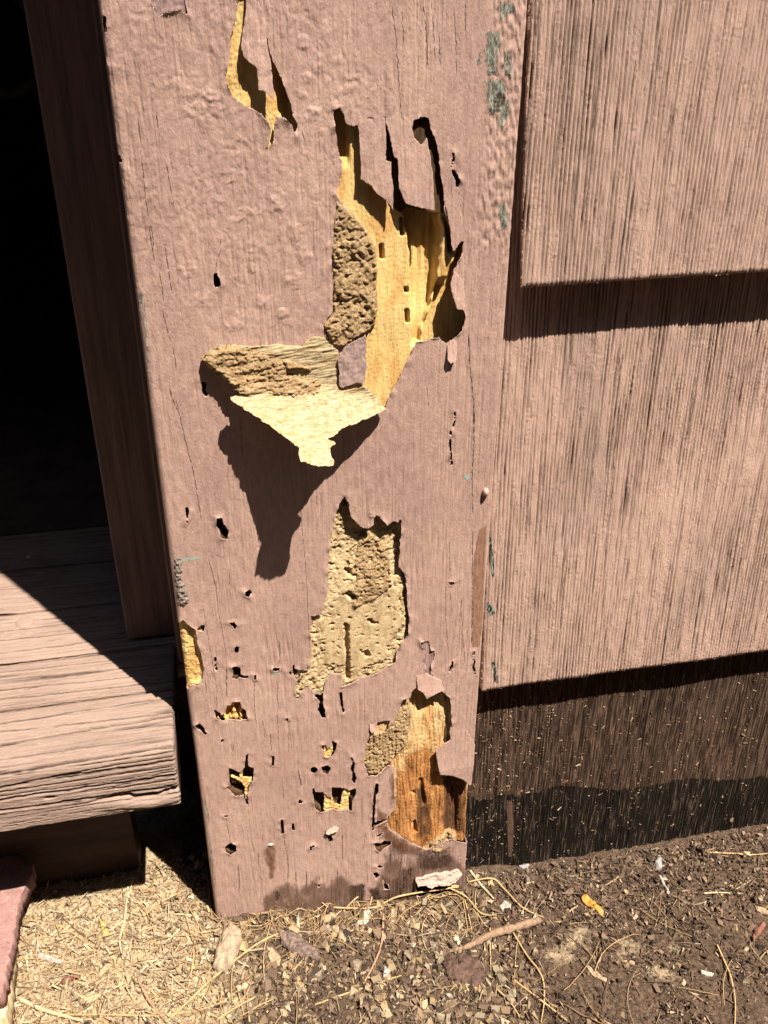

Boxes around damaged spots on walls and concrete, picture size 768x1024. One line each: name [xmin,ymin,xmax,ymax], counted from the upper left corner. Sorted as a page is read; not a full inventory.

peeling [226,0,297,150]
spalling [323,108,466,407]
peeling [179,620,204,689]
peeling [214,702,248,721]
spalling [295,497,409,697]
spalling [364,641,475,894]